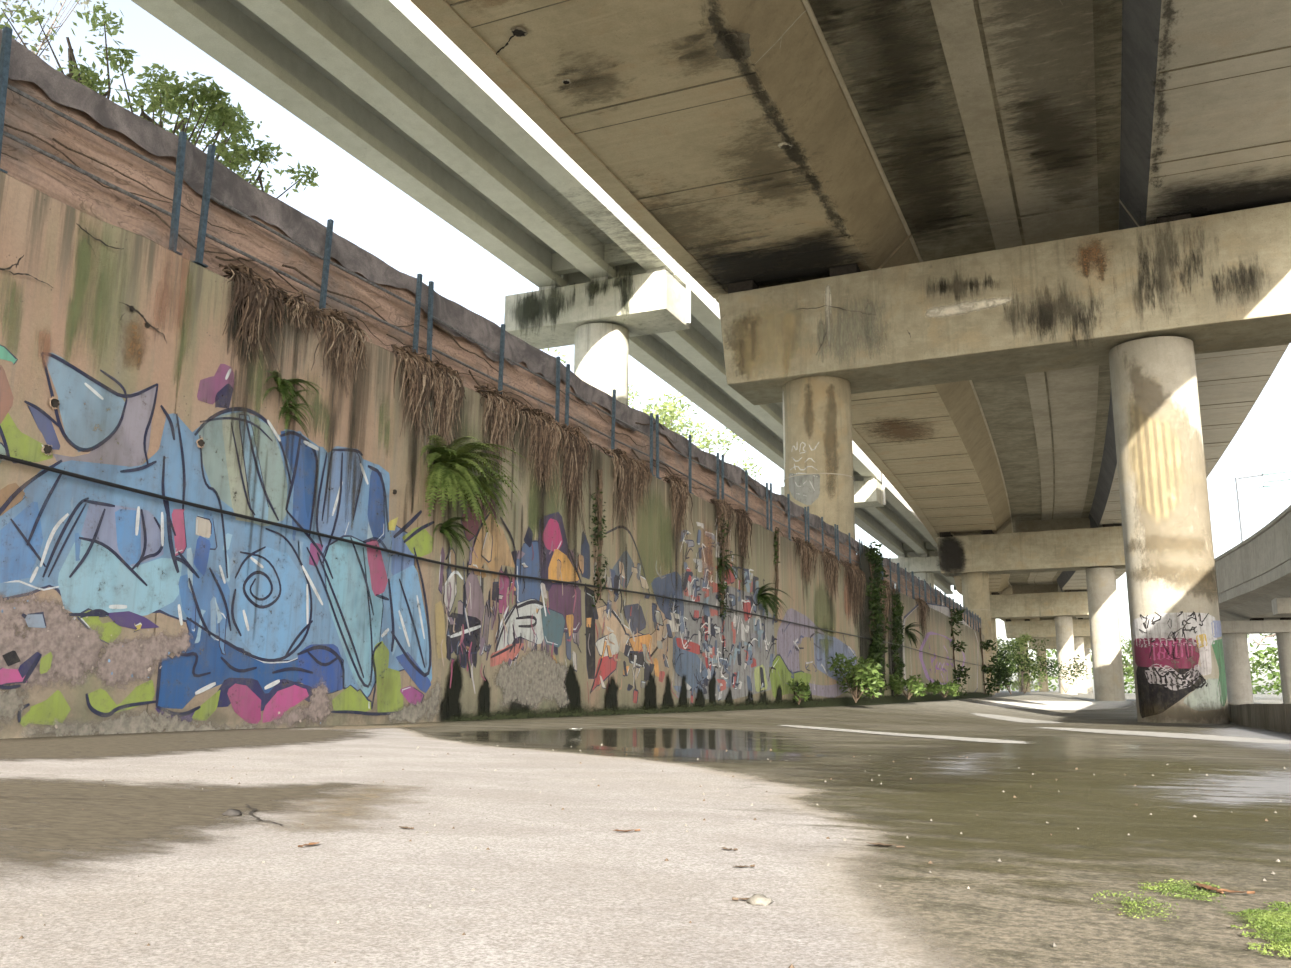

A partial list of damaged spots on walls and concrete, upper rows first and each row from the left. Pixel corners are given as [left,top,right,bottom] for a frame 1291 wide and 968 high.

leakage [695,0,883,357]
crack [0,255,53,288]
crack [119,302,167,343]
leakage [514,275,633,333]
leakage [927,277,1093,337]
rust [1074,240,1105,280]
leakage [1135,237,1202,311]
leakage [1214,268,1263,300]
rust [870,419,926,440]
peeling [0,592,191,727]
peeling [496,650,569,709]
peeling [22,683,332,737]